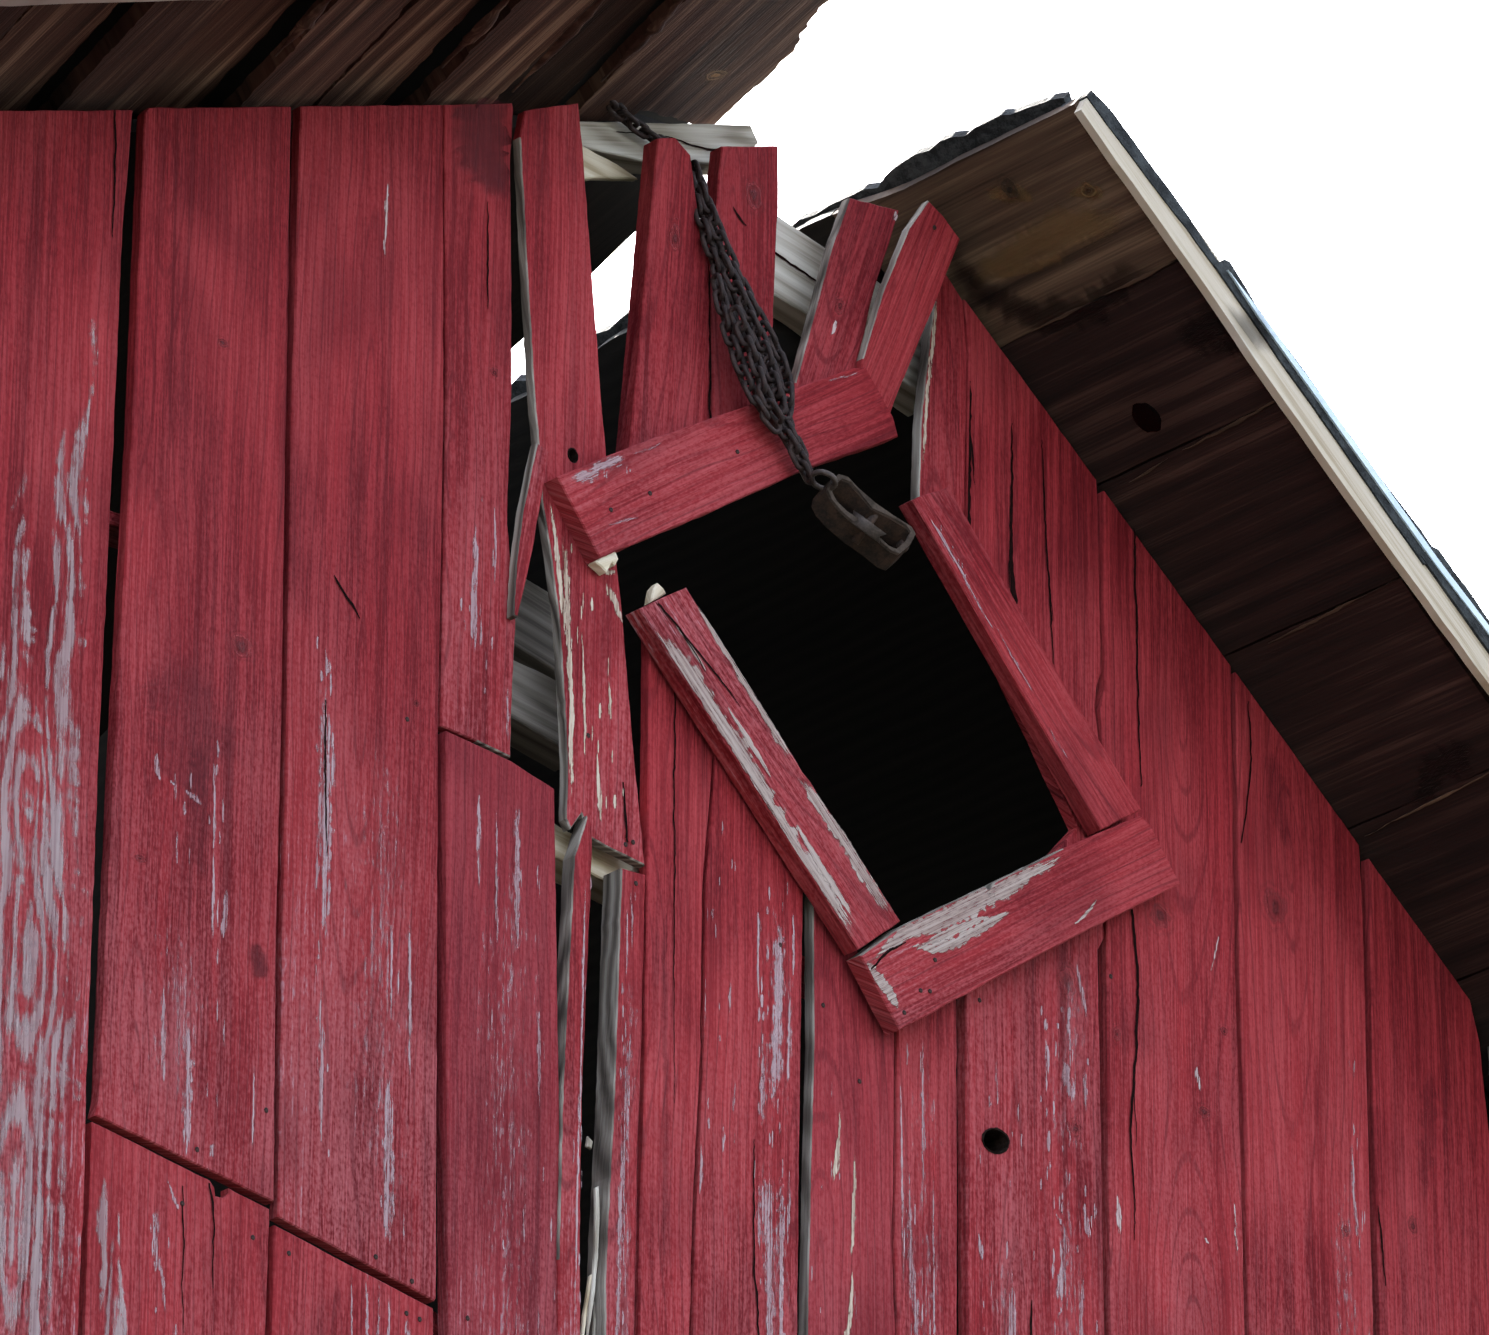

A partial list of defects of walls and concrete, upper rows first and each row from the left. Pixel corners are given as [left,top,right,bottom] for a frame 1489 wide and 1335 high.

peeling [0,389,93,1335]
peeling [316,636,335,972]
peeling [551,508,624,820]
peeling [658,610,851,925]
peeling [754,882,795,1335]
peeling [801,782,887,910]
peeling [867,858,1059,1008]
crack [967,381,975,525]
crack [1008,423,1054,664]
peeling [1040,965,1098,1335]
crack [1130,909,1140,1240]
crack [1241,701,1252,843]